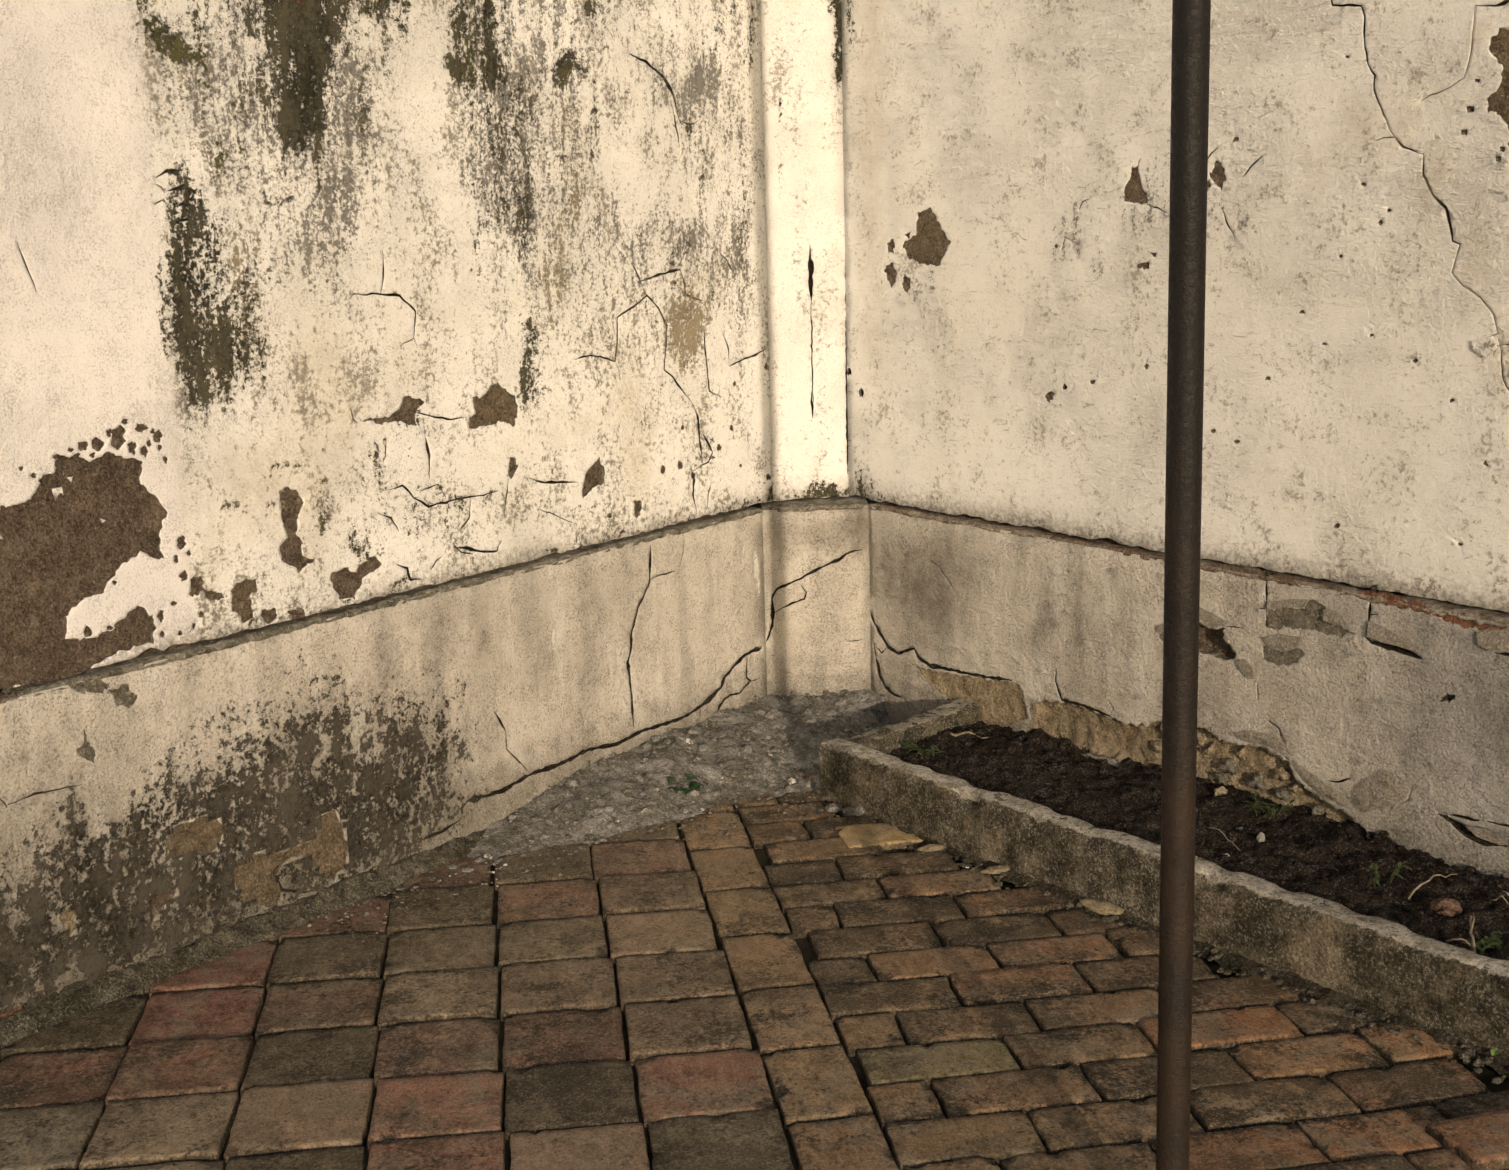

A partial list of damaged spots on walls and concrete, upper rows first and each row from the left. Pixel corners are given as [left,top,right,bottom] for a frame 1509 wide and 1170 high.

water stain [142,0,418,414]
water stain [435,0,784,453]
flaking render [885,208,951,292]
crack [1331,0,1509,390]
flaking render [1462,28,1509,162]
flaking render [0,419,321,708]
water stain [292,649,342,700]
water stain [316,410,493,595]
flaking render [363,384,517,429]
crack [381,438,577,581]
crack [402,546,863,859]
crack [574,266,765,511]